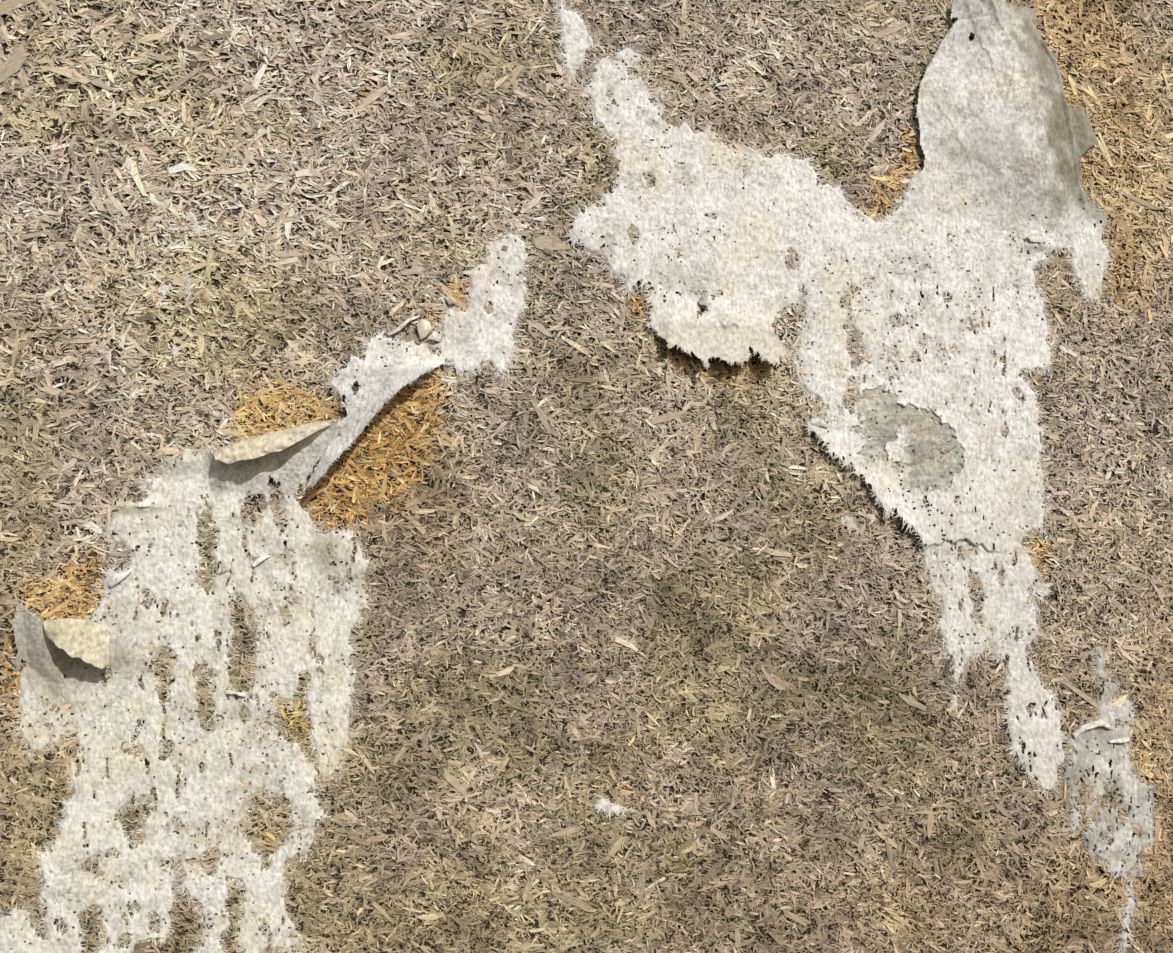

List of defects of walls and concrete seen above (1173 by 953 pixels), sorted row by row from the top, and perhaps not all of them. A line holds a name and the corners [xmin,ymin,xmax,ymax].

peeling [155,272,195,307]
peeling [839,515,861,537]
peeling [1031,579,1052,604]